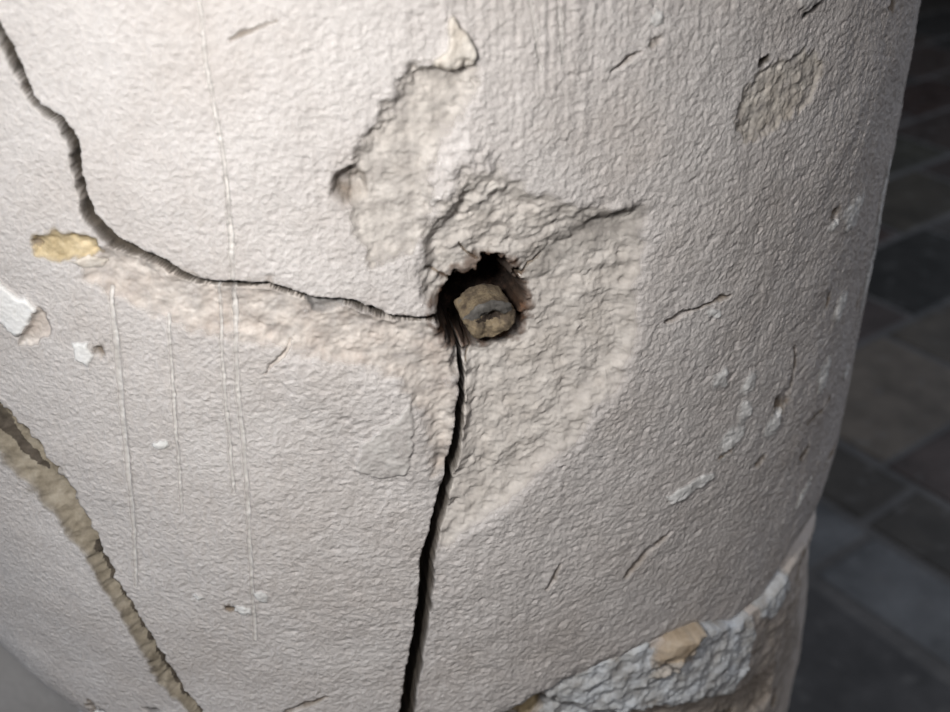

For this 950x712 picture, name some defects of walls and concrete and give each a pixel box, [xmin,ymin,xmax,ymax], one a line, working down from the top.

crack [0,23,305,297]
peeling [19,307,51,346]
spalling [84,17,643,545]
corrosion [428,251,532,347]
crack [512,252,540,275]
crack [345,298,470,712]
crack [0,402,203,712]
peeling [751,559,801,620]
peeling [653,649,697,679]
spalling [630,671,776,712]